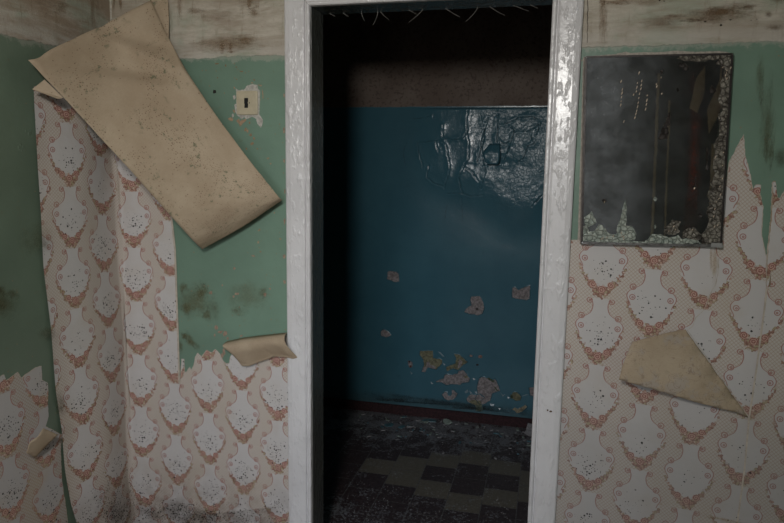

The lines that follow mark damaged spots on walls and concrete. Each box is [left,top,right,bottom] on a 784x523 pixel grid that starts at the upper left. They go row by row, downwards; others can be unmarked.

flaking render [228,67,263,150]
peeling [407,350,534,414]